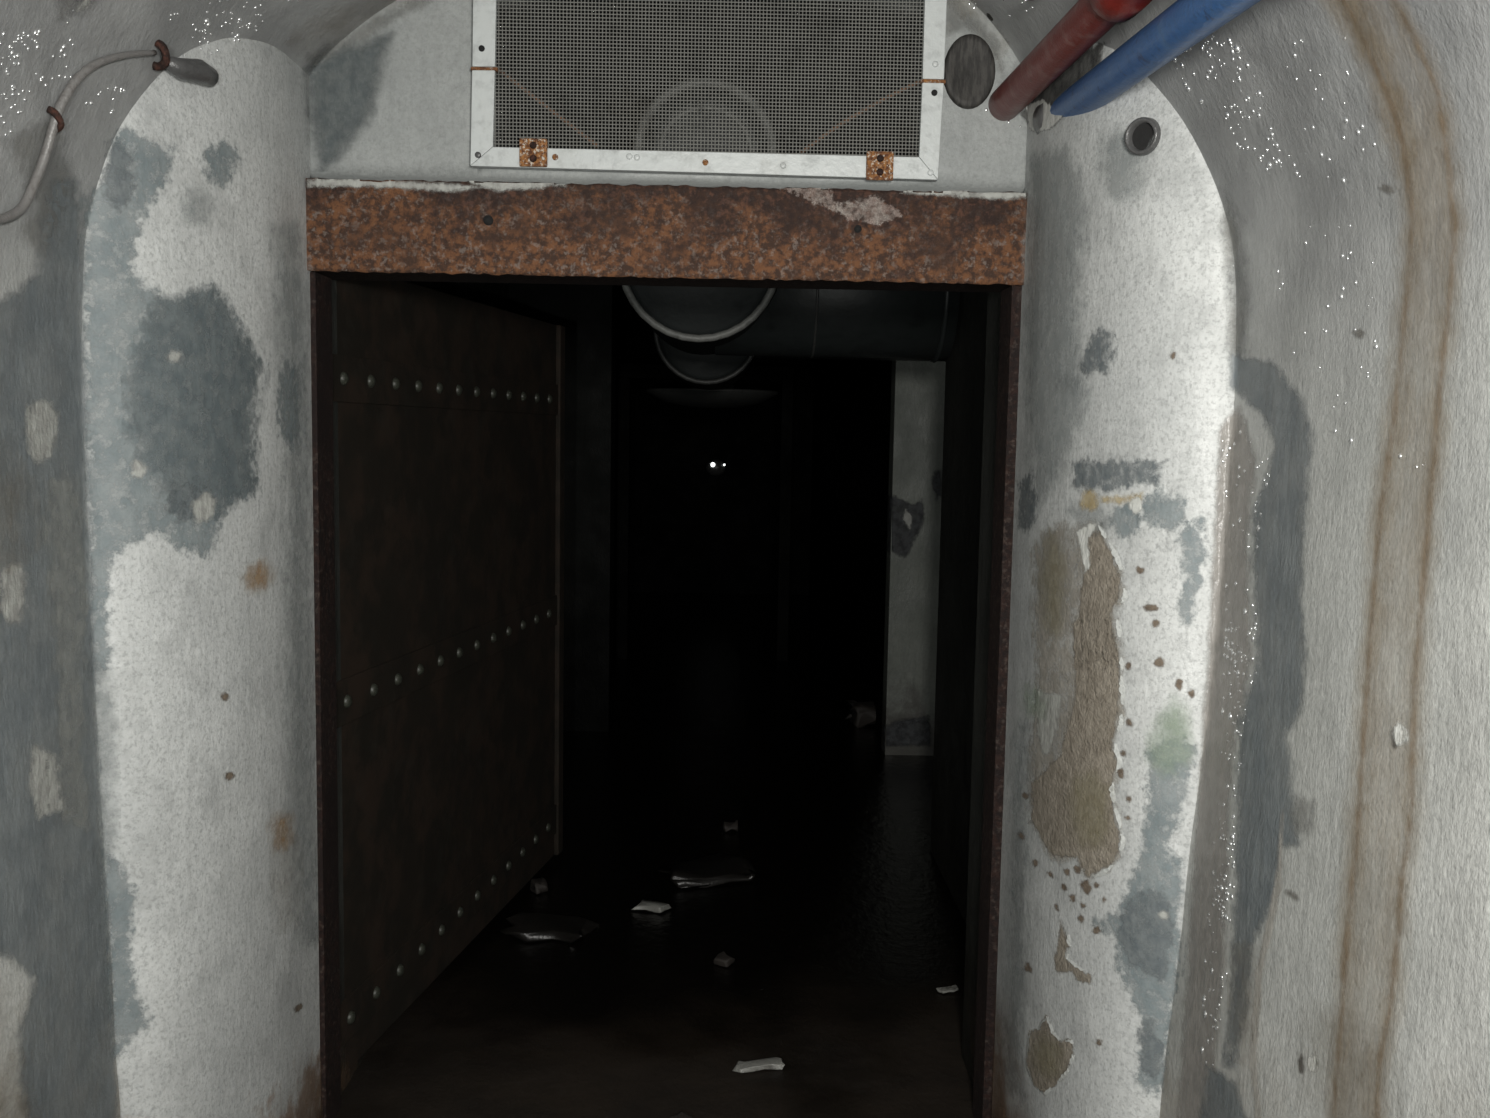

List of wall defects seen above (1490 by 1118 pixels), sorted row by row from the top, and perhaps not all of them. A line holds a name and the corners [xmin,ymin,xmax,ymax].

damp [0,129,319,1118]
peeling [1025,1015,1075,1096]
peeling [1019,521,1159,983]
damp [1017,153,1311,1118]